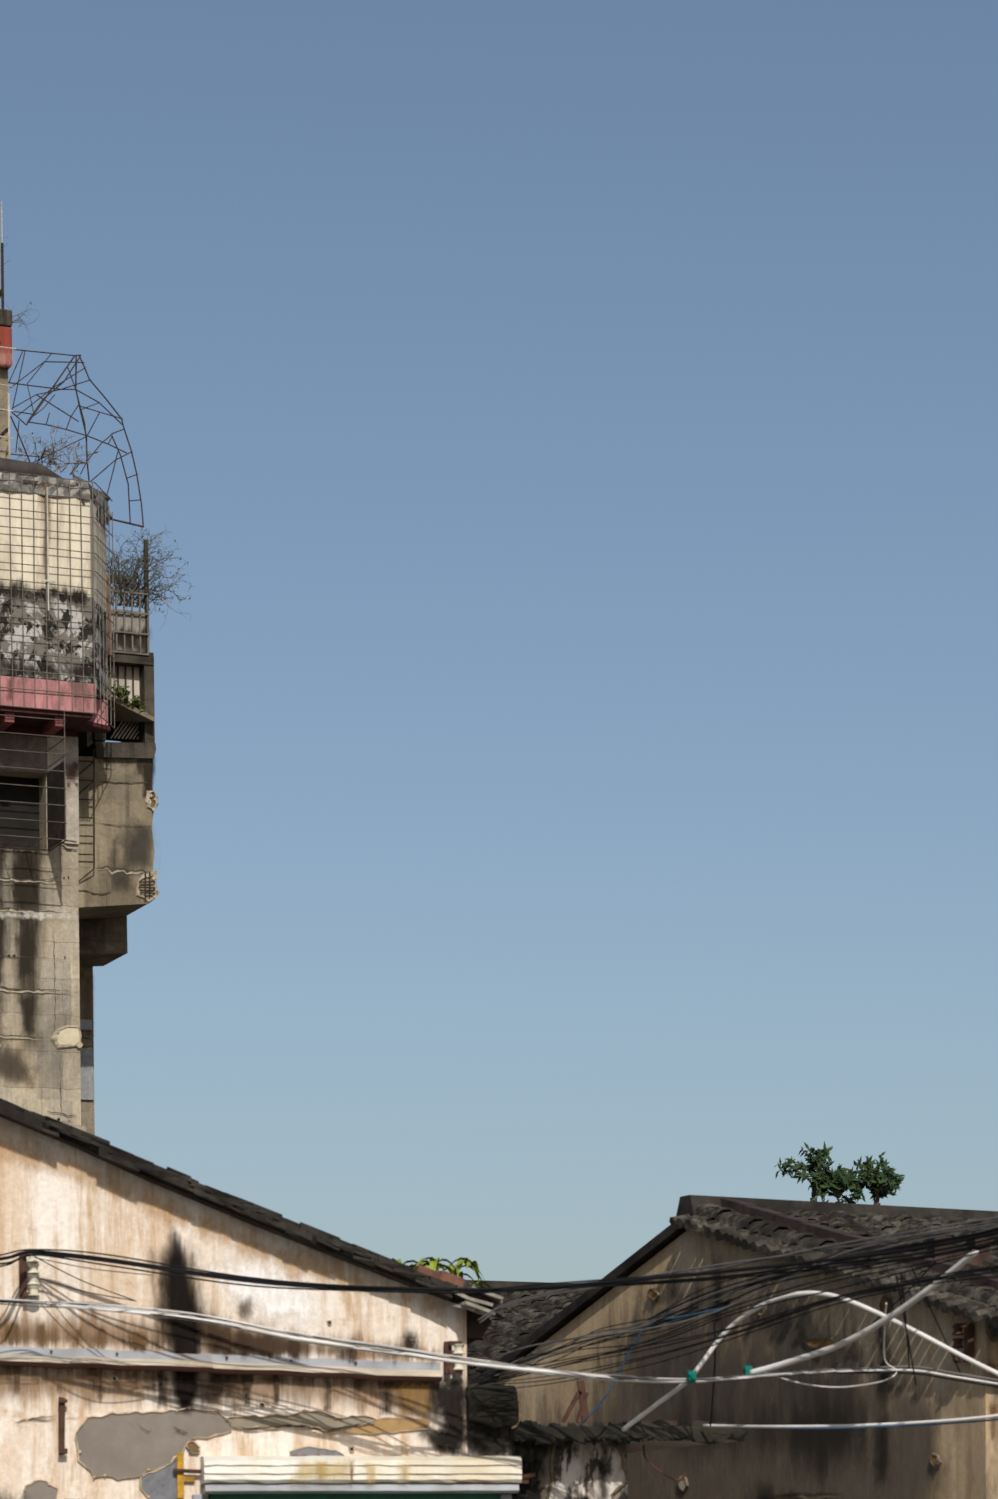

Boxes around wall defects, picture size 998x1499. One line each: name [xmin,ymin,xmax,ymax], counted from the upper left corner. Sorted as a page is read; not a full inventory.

leakage [0,849,70,1080]
leakage [0,1145,333,1275]
leakage [0,1248,938,1499]
flaking render [23,1480,58,1499]
flaking render [74,1402,430,1499]